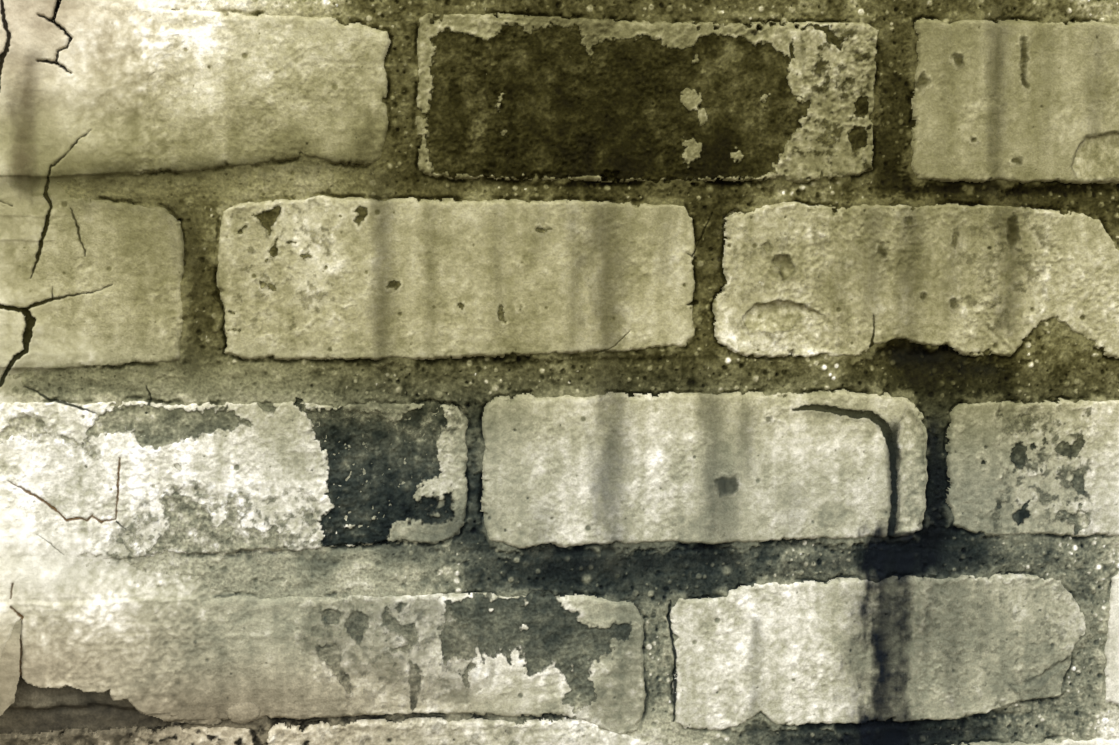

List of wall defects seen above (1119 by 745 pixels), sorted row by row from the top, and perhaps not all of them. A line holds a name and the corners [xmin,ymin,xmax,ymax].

crack [0,0,11,89]
crack [38,0,73,73]
peeling [425,22,873,183]
crack [0,133,108,413]
crack [13,458,123,552]
peeling [0,402,253,459]
peeling [110,398,466,562]
damp [844,418,940,745]
spalling [0,619,177,745]
peeling [191,729,261,745]
peeling [317,602,422,711]
peeling [437,589,632,719]